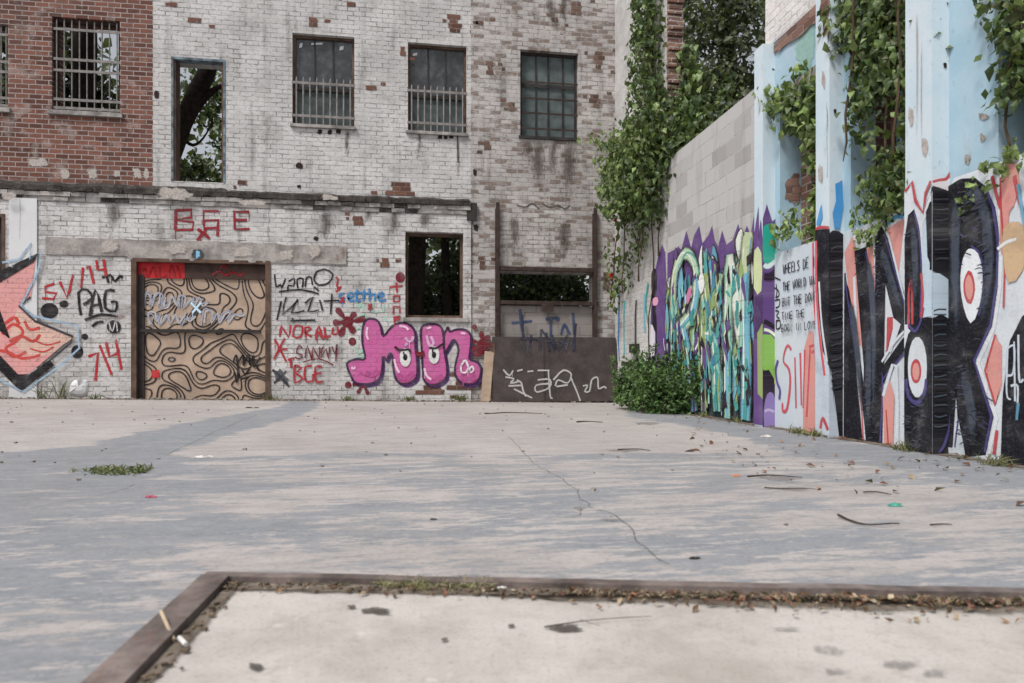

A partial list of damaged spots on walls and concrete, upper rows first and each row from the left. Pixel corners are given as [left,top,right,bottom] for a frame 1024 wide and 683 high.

leakage [527,143,574,177]
flaking render [785,173,801,205]